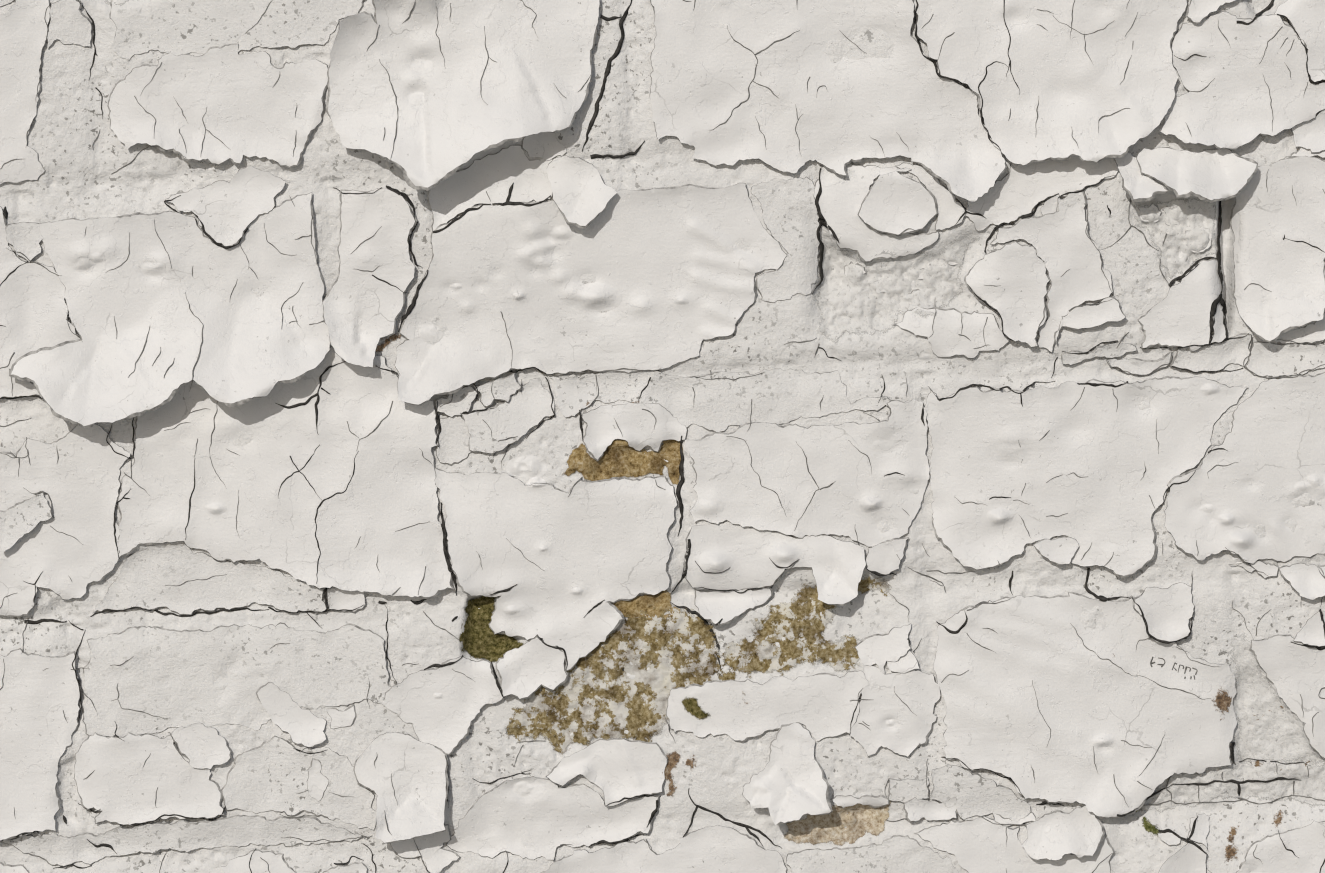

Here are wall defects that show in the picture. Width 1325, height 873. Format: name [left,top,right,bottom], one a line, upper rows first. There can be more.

crack [79,3,551,559]
crack [555,0,645,159]
peeling [105,0,1325,627]
crack [714,0,916,294]
crack [914,0,1138,155]
crack [868,169,1325,538]
crack [0,361,541,873]
peeling [0,166,683,873]
crack [553,789,780,862]
peeling [541,582,1325,873]
crack [1073,540,1268,699]
crack [1093,694,1325,873]